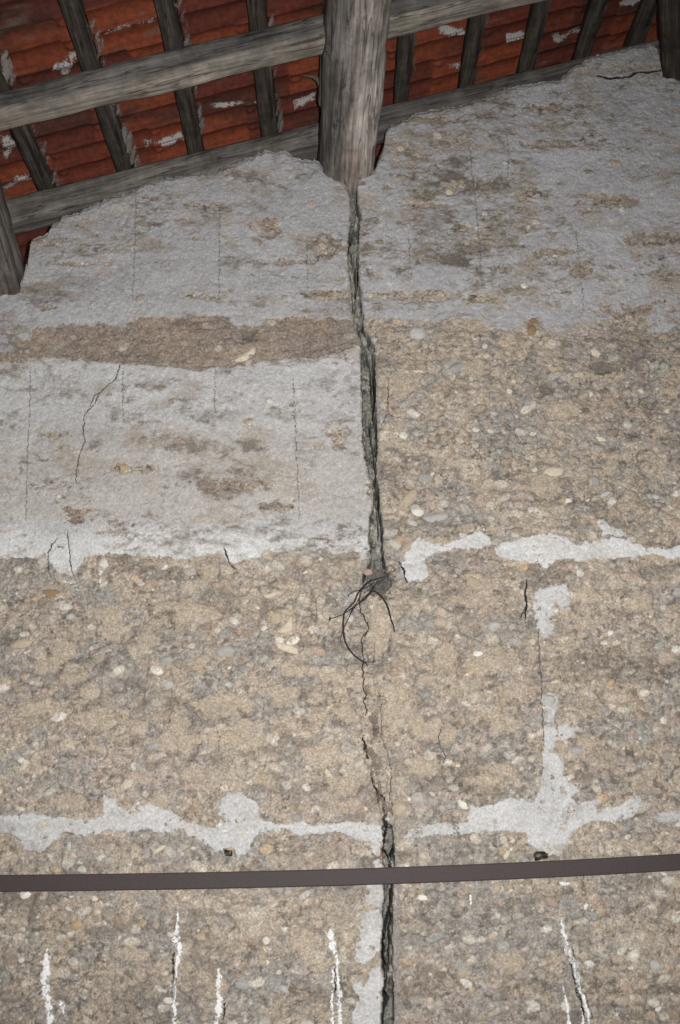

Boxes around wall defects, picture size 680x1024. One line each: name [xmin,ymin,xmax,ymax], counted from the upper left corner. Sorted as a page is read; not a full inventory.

crack [596,70,661,80]
crack [75,364,120,484]
crack [347,190,408,1024]
efflorescence [40,948,66,1024]
water stain [171,911,182,1024]
efflorescence [213,968,227,1024]
efflorescence [327,929,343,1024]
water stain [560,919,590,1024]